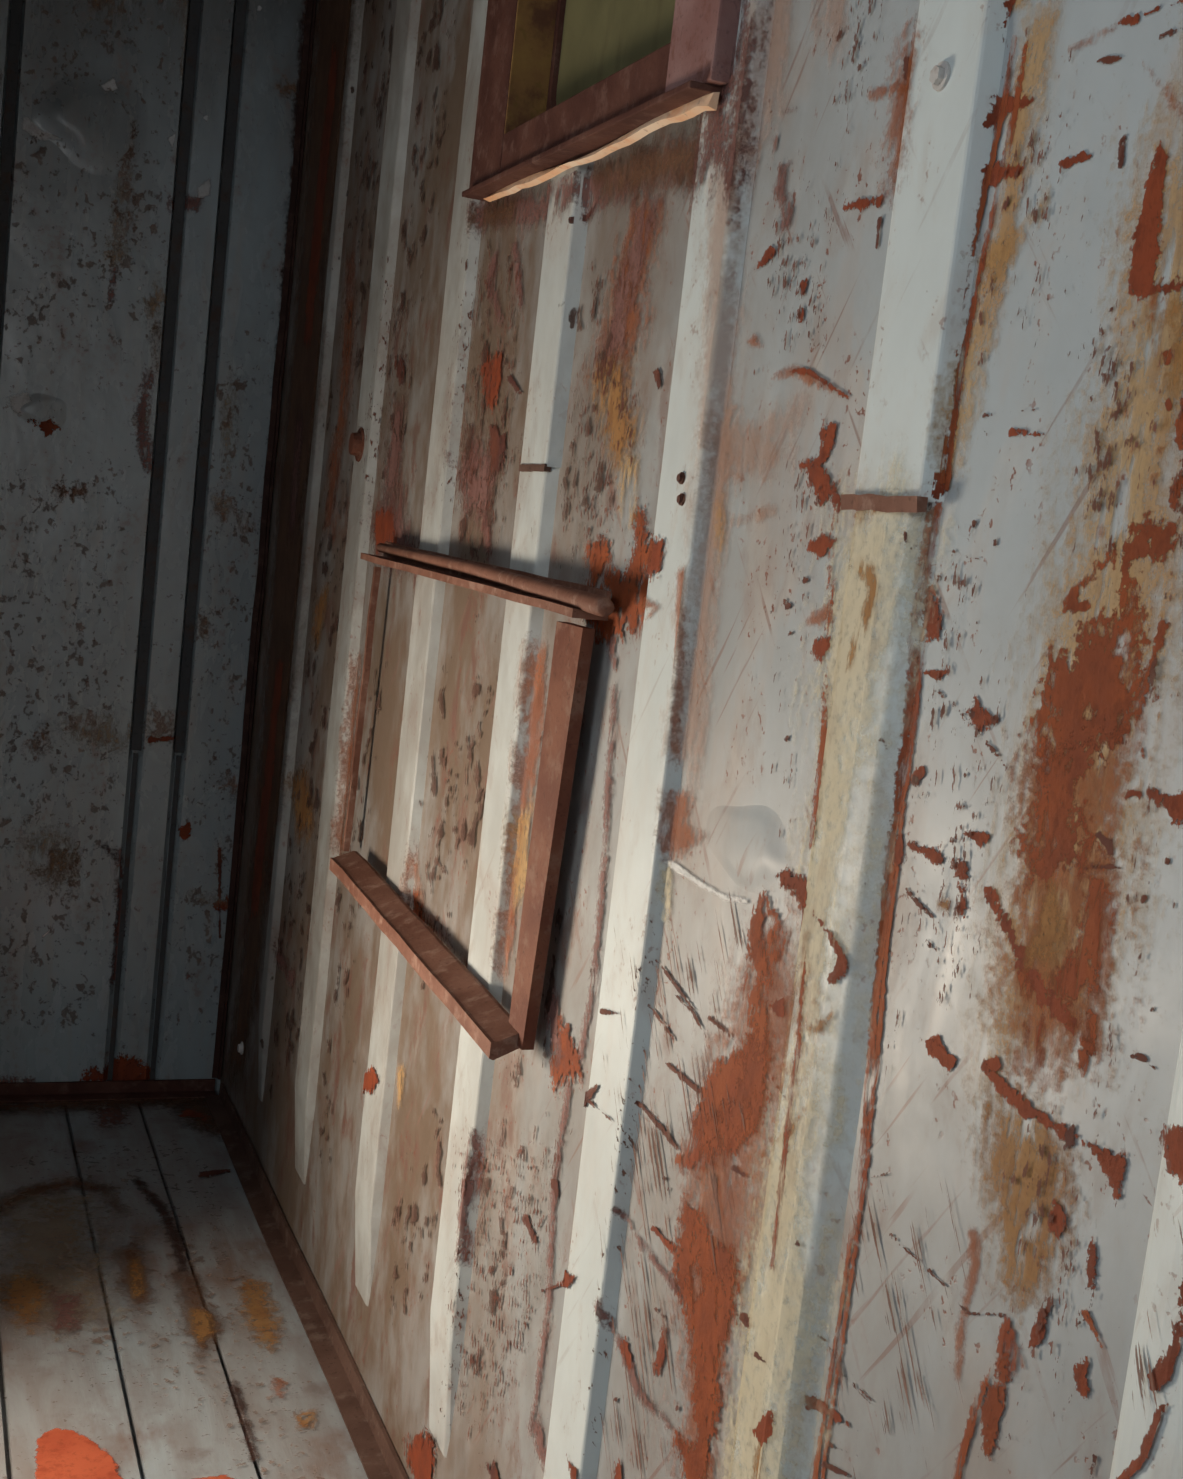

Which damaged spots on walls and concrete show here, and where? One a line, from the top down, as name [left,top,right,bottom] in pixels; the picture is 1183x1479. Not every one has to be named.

rust [658,791,701,856]
rust [441,0,920,753]
rust [670,0,1070,1479]
rust [933,134,1183,1087]
rust [229,1381,259,1461]
rust [953,1095,1103,1479]